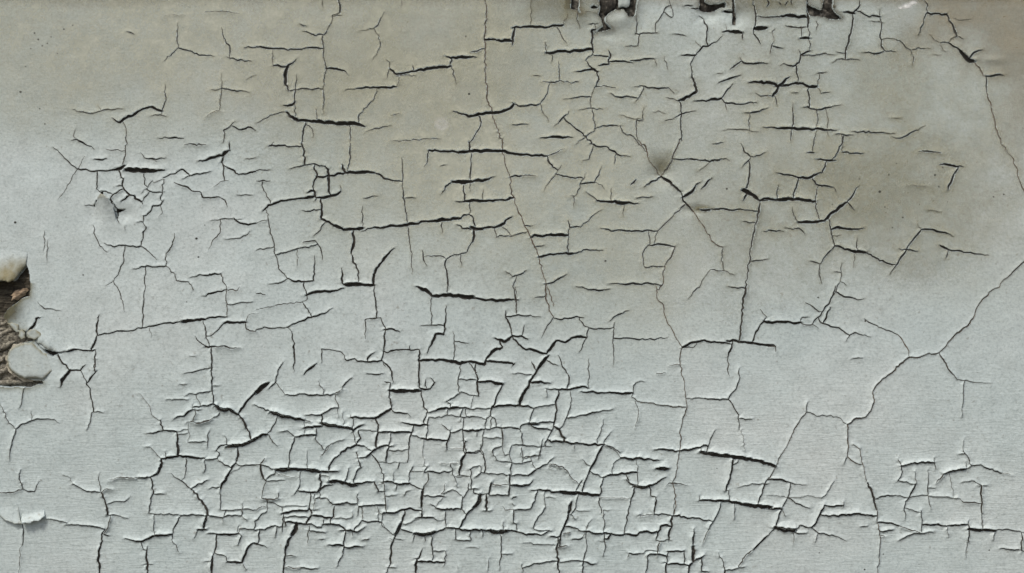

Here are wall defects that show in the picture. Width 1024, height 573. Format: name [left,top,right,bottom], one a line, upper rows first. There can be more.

peeling [571,0,637,32]
peeling [699,0,736,25]
peeling [807,0,842,20]
crack [918,0,1024,191]
crack [53,86,227,308]
peeling [0,250,58,387]
crack [57,233,251,429]
crack [113,0,930,573]
crack [829,262,1024,467]
crack [52,477,130,573]
crack [877,481,1024,570]
crack [936,450,1000,491]